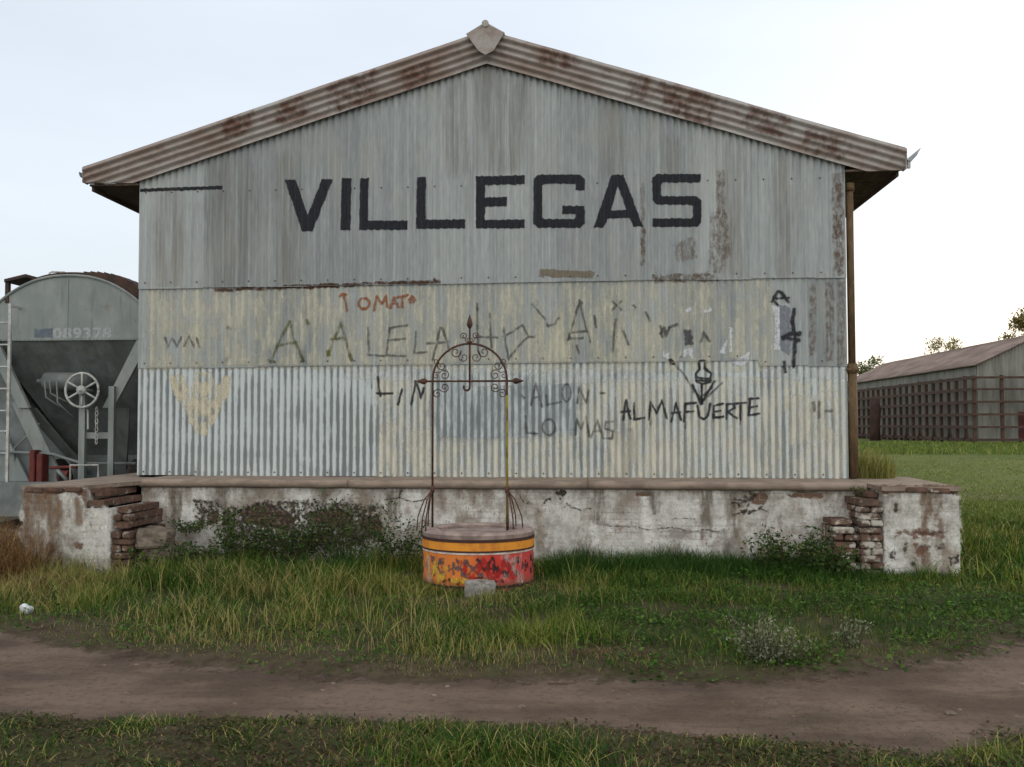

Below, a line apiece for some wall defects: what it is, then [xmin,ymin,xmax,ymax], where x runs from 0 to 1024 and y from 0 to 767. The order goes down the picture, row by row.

corrosion [331,71,374,111]
corrosion [663,87,711,123]
corrosion [746,107,785,136]
peeling [36,489,110,572]
peeling [877,484,961,561]